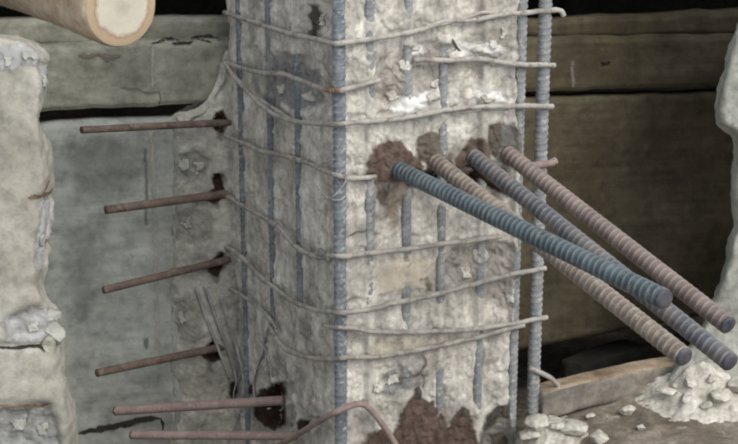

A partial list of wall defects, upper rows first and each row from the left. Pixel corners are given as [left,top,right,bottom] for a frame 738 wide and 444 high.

crack [78,53,122,62]
crack [152,34,224,45]
spalling [364,0,528,157]
rust [80,119,232,134]
rust [455,138,507,195]
spalling [264,0,348,444]
spalling [401,185,412,329]
crack [0,335,48,352]
spalling [5,306,58,343]
crack [78,416,164,435]
rust [113,381,310,441]
rust [364,386,478,444]